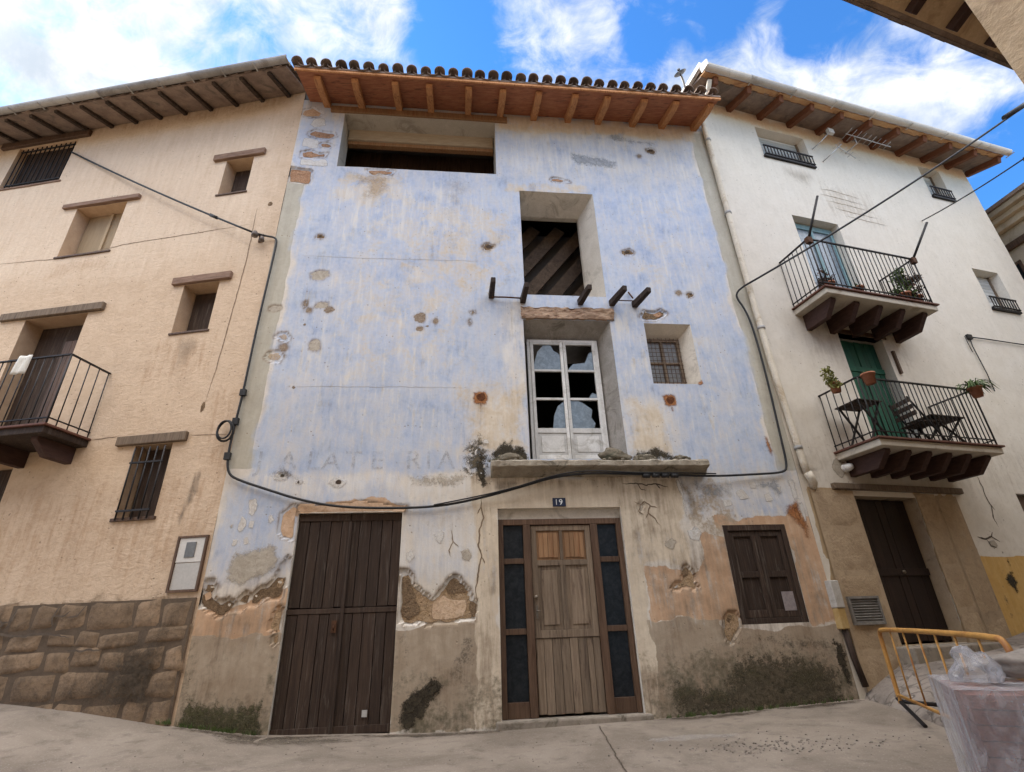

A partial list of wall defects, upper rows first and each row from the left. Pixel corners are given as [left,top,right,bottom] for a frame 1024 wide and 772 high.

peeling [290,109,334,184]
corrosion [473,392,488,405]
corrosion [663,394,676,411]
peeling [269,501,393,538]
crack [624,483,667,523]
corrosion [787,502,808,537]
crack [978,478,1000,548]
peeling [202,499,285,615]
crack [448,501,485,601]
spalling [401,574,477,623]
leakage [824,639,852,684]
leakage [398,677,444,731]